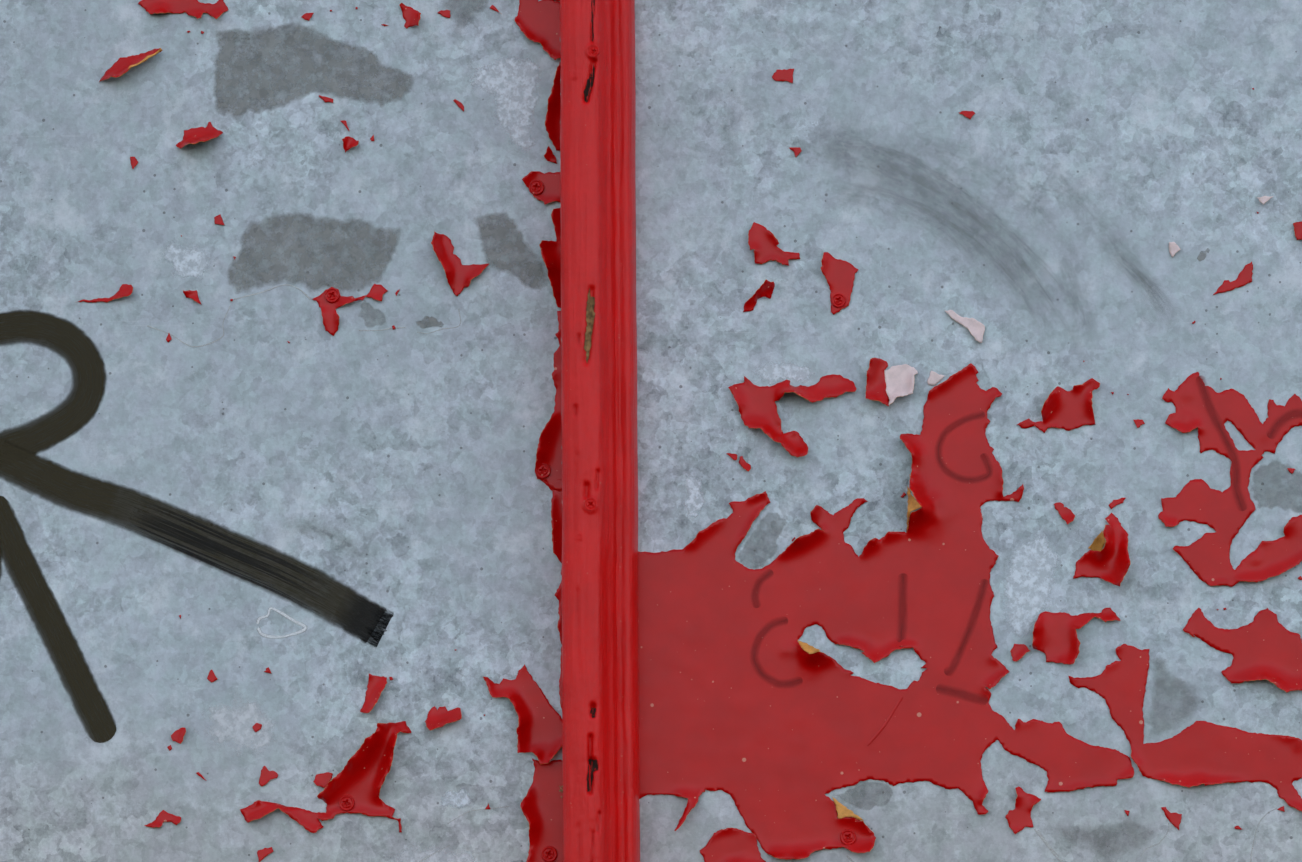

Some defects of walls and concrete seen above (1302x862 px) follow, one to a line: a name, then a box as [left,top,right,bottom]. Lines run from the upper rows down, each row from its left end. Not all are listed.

peeling [138,0,228,34]
peeling [381,3,421,29]
peeling [99,48,162,82]
peeling [176,122,223,149]
peeling [312,284,399,336]
peeling [431,231,489,296]
peeling [743,280,775,312]
peeling [748,222,800,266]
peeling [821,252,859,315]
peeling [483,0,563,862]
peeling [638,358,1302,862]
peeling [240,674,462,833]